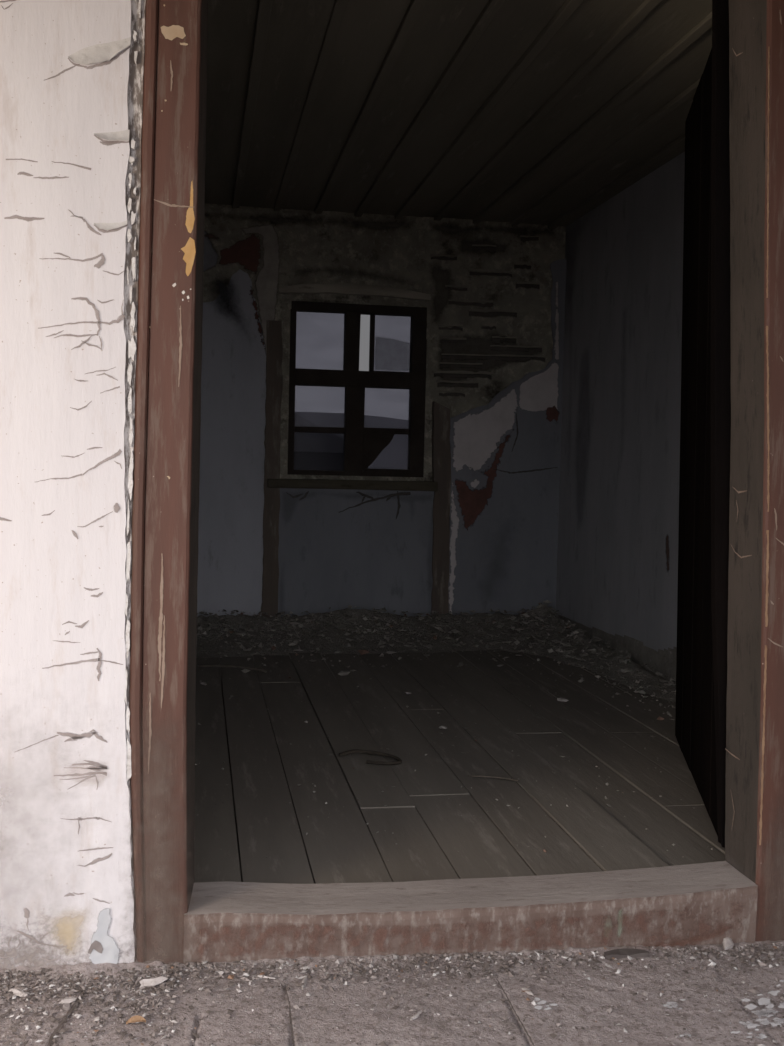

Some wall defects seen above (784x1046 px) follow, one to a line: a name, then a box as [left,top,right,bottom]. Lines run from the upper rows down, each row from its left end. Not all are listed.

peeling [161,25,188,45]
crack [6,159,91,179]
crack [4,214,44,222]
crack [39,210,124,275]
crack [42,297,125,410]
spalling [154,180,423,479]
crack [38,447,122,482]
peeling [448,282,560,614]
crack [42,587,123,681]
peeling [148,553,165,774]
crack [15,729,107,790]
spalling [88,908,120,964]